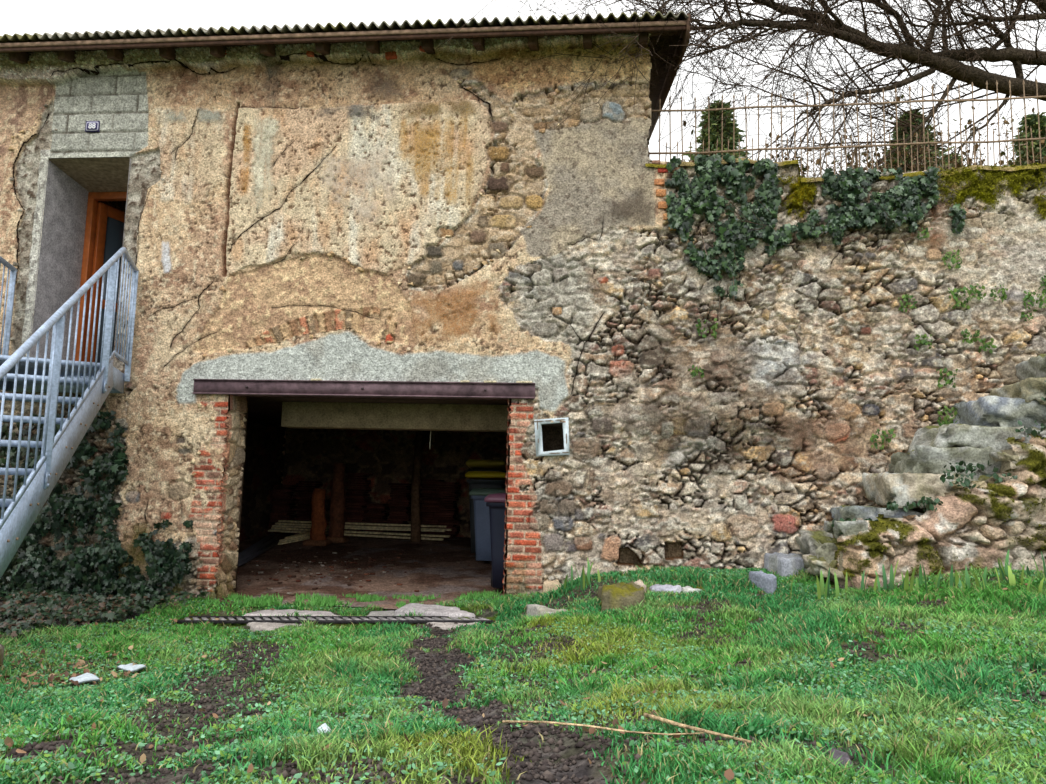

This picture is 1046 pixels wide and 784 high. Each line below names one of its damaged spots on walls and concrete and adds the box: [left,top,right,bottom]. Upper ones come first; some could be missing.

crack [50,59,236,80]
crack [436,58,501,117]
crack [7,112,50,285]
crack [148,100,336,368]
flaking render [193,76,651,357]